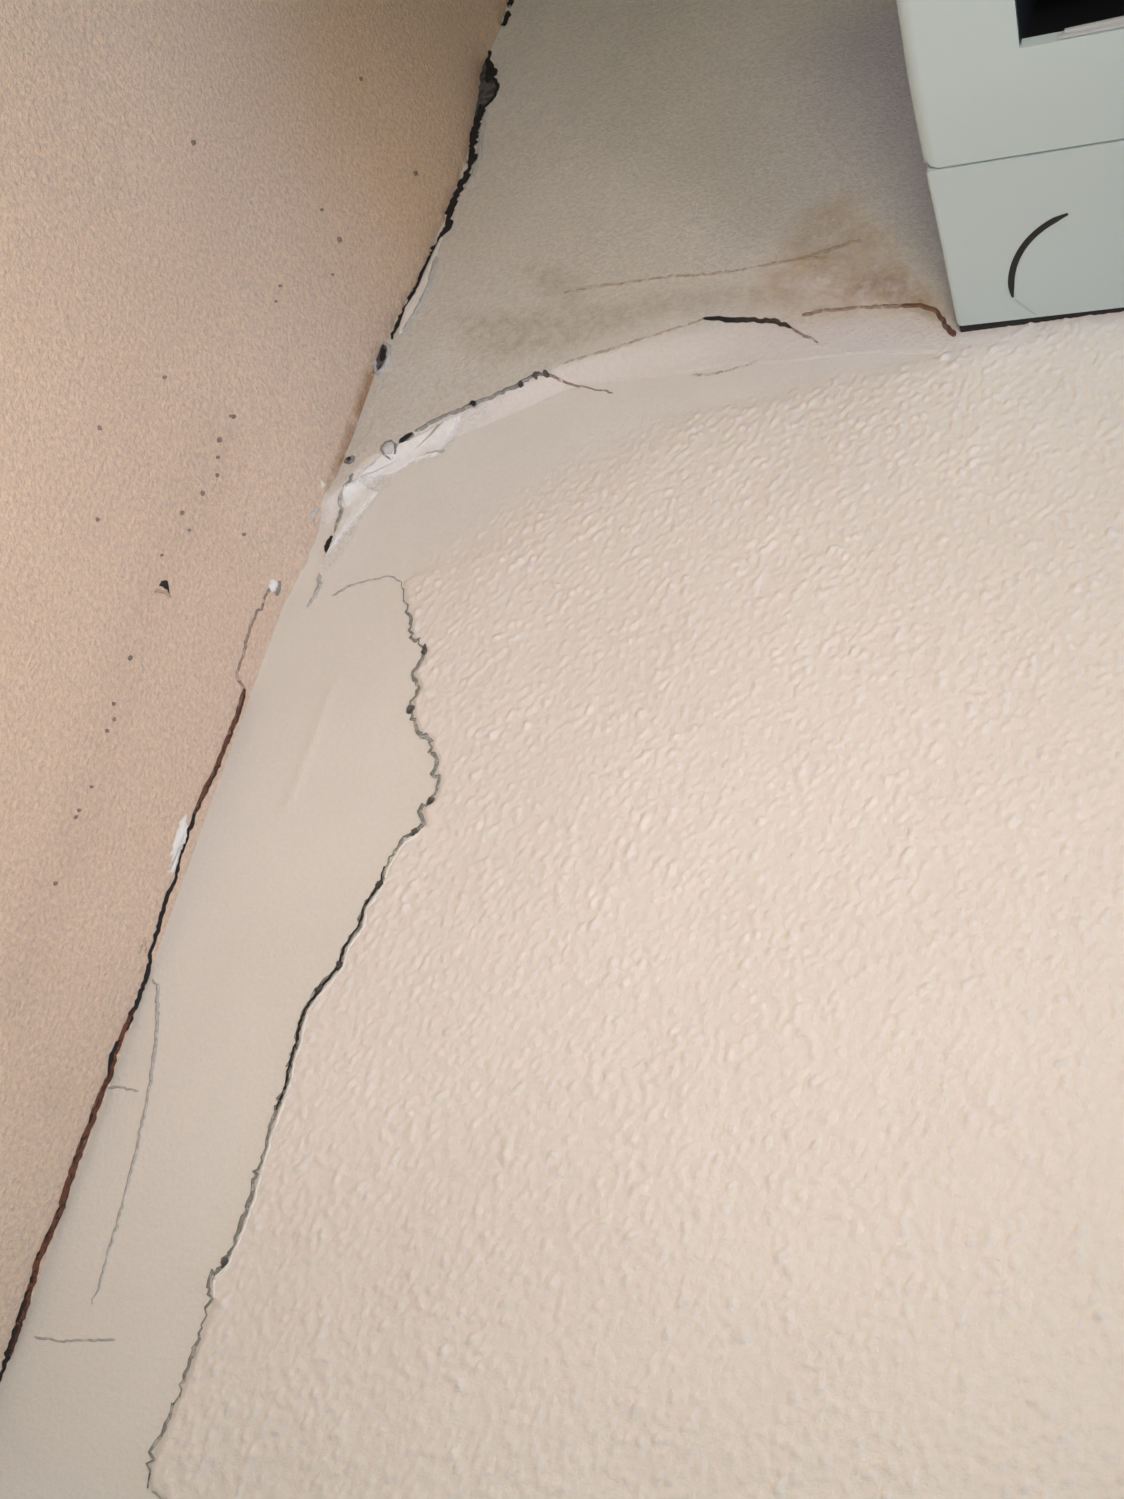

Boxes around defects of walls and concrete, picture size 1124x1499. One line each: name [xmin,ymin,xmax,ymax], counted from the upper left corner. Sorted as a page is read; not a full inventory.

crack [390,0,514,339]
flaking render [373,237,443,376]
crack [564,240,859,294]
flaking render [311,408,480,563]
crack [334,303,956,533]
peeling [268,578,281,596]